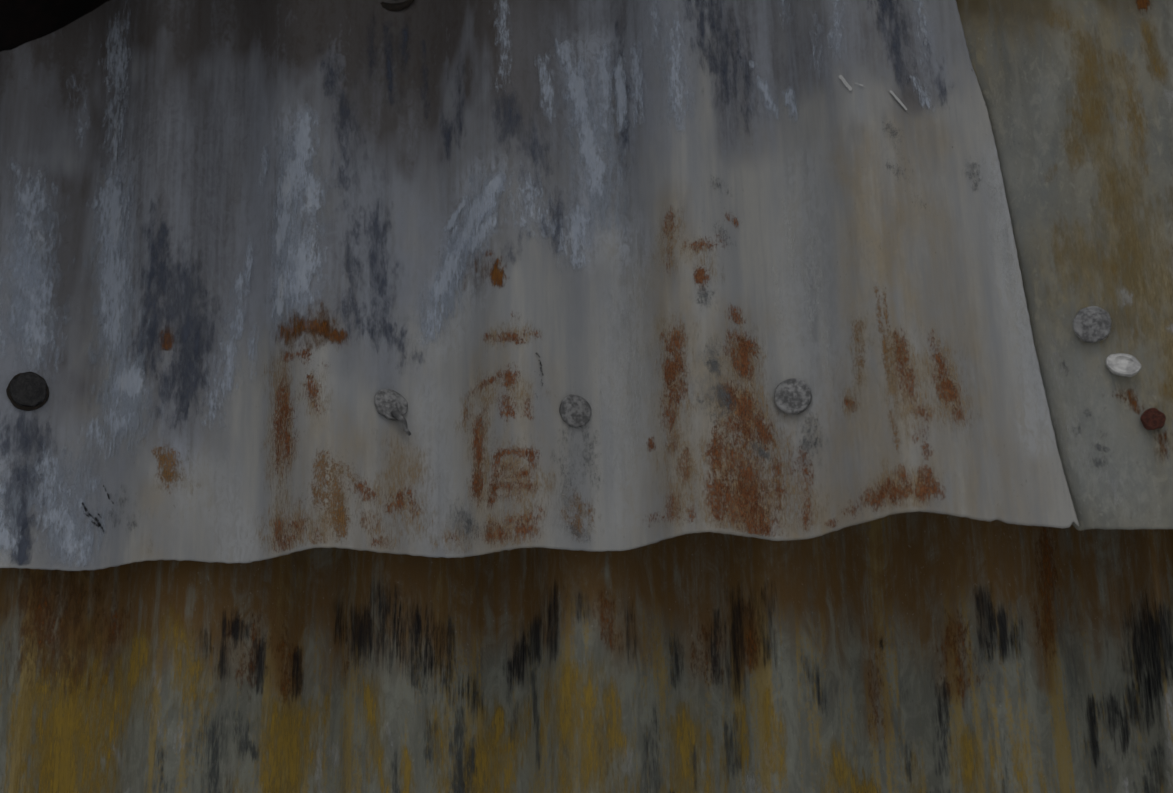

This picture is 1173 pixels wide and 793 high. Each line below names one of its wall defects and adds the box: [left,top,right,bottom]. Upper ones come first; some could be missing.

rust [475,250,506,287]
rust [663,213,727,289]
rust [268,303,348,487]
rust [264,451,433,551]
rust [434,364,552,545]
rust [648,287,970,536]